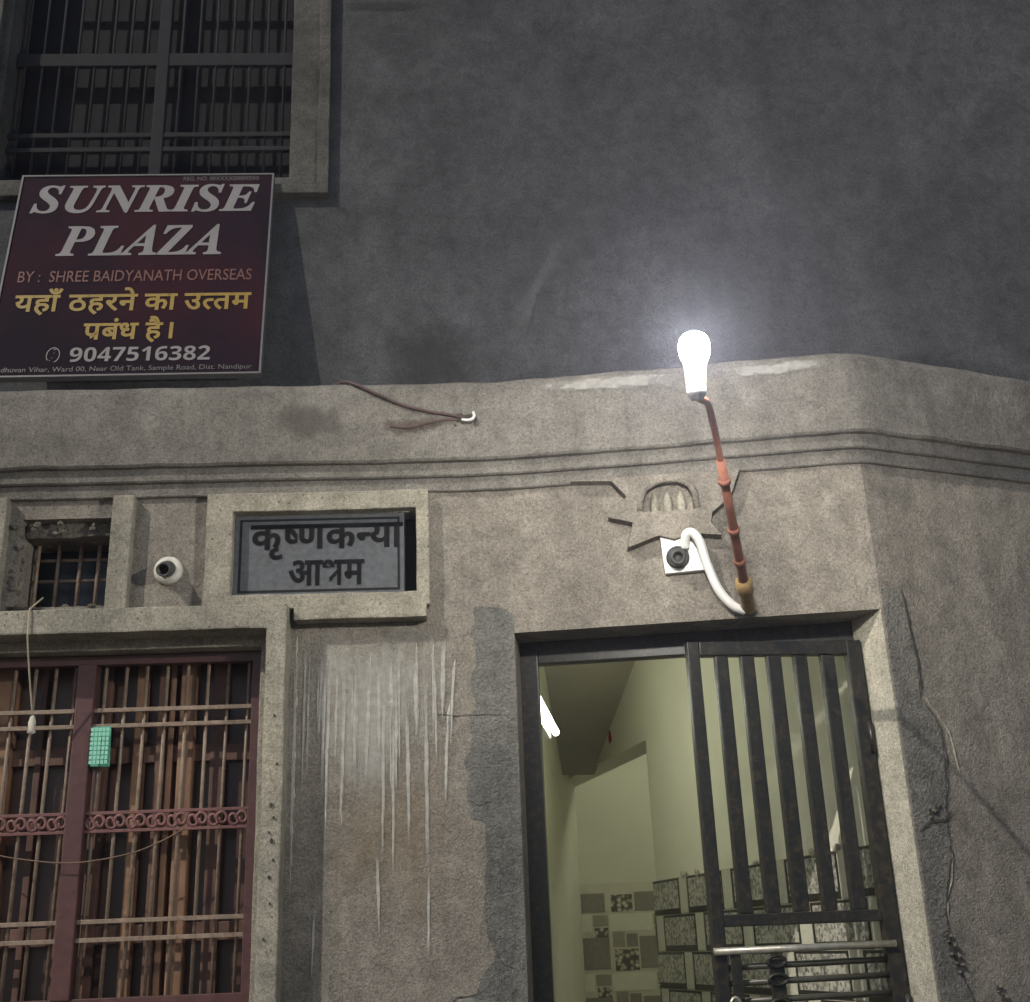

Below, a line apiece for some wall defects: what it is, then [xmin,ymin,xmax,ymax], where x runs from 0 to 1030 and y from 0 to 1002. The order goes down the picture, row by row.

water stain [289,636,456,896]
peeling [465,606,528,1002]
crack [901,589,976,1002]